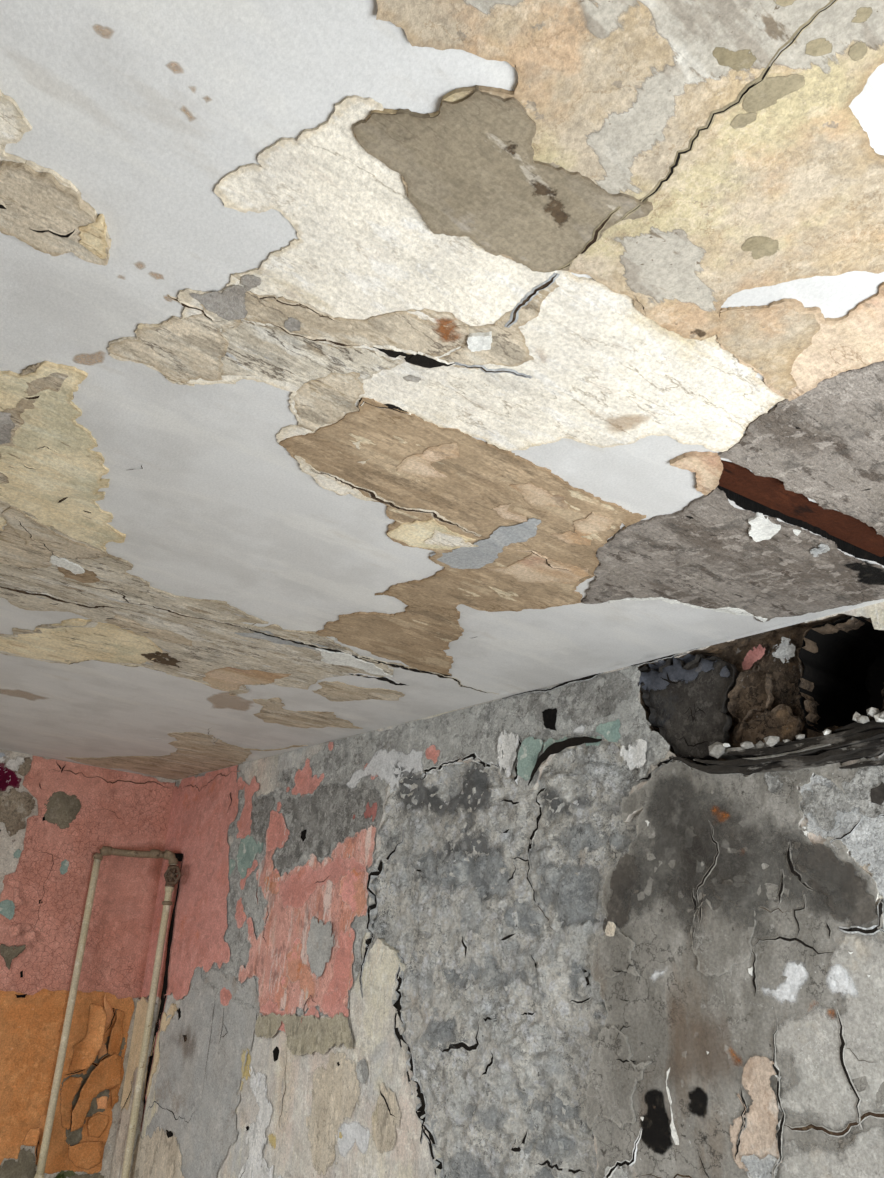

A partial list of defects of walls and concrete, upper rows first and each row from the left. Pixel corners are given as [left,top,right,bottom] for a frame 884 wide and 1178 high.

crack [504,0,838,328]
crack [358,398,411,415]
crack [246,291,532,379]
peeling [0,0,884,702]
crack [359,827,448,1178]
spalling [0,613,884,1178]
crack [400,736,602,935]
water stain [763,962,807,1002]
crack [750,842,884,997]
water stain [827,965,857,995]
crack [605,1128,710,1178]
crack [772,1010,884,1178]